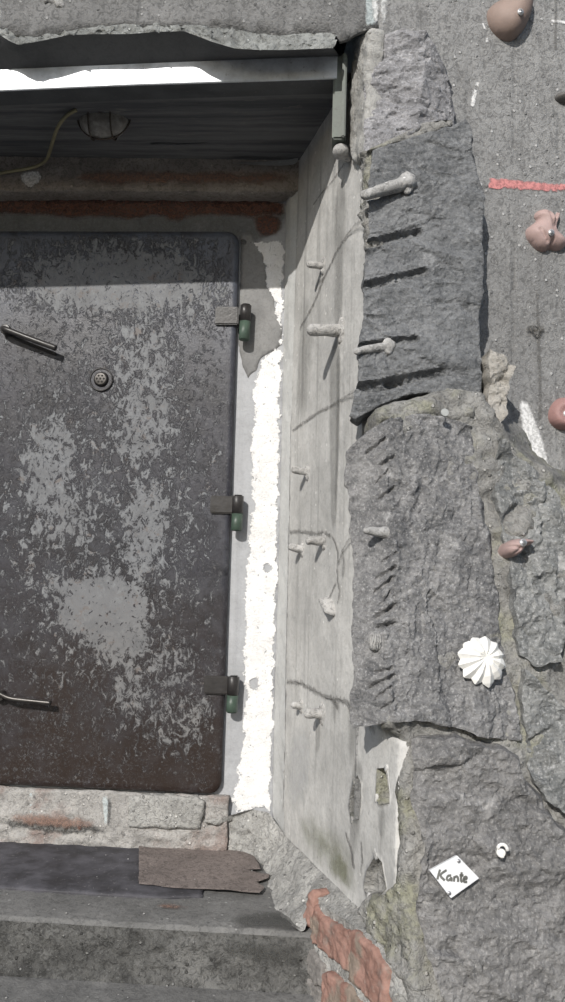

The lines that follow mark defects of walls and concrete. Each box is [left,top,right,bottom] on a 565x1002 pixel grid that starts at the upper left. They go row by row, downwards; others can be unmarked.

spalling [0,20,337,51]
peeling [231,240,285,813]
spalling [349,775,361,824]
spalling [374,764,390,805]
spalling [363,852,387,897]